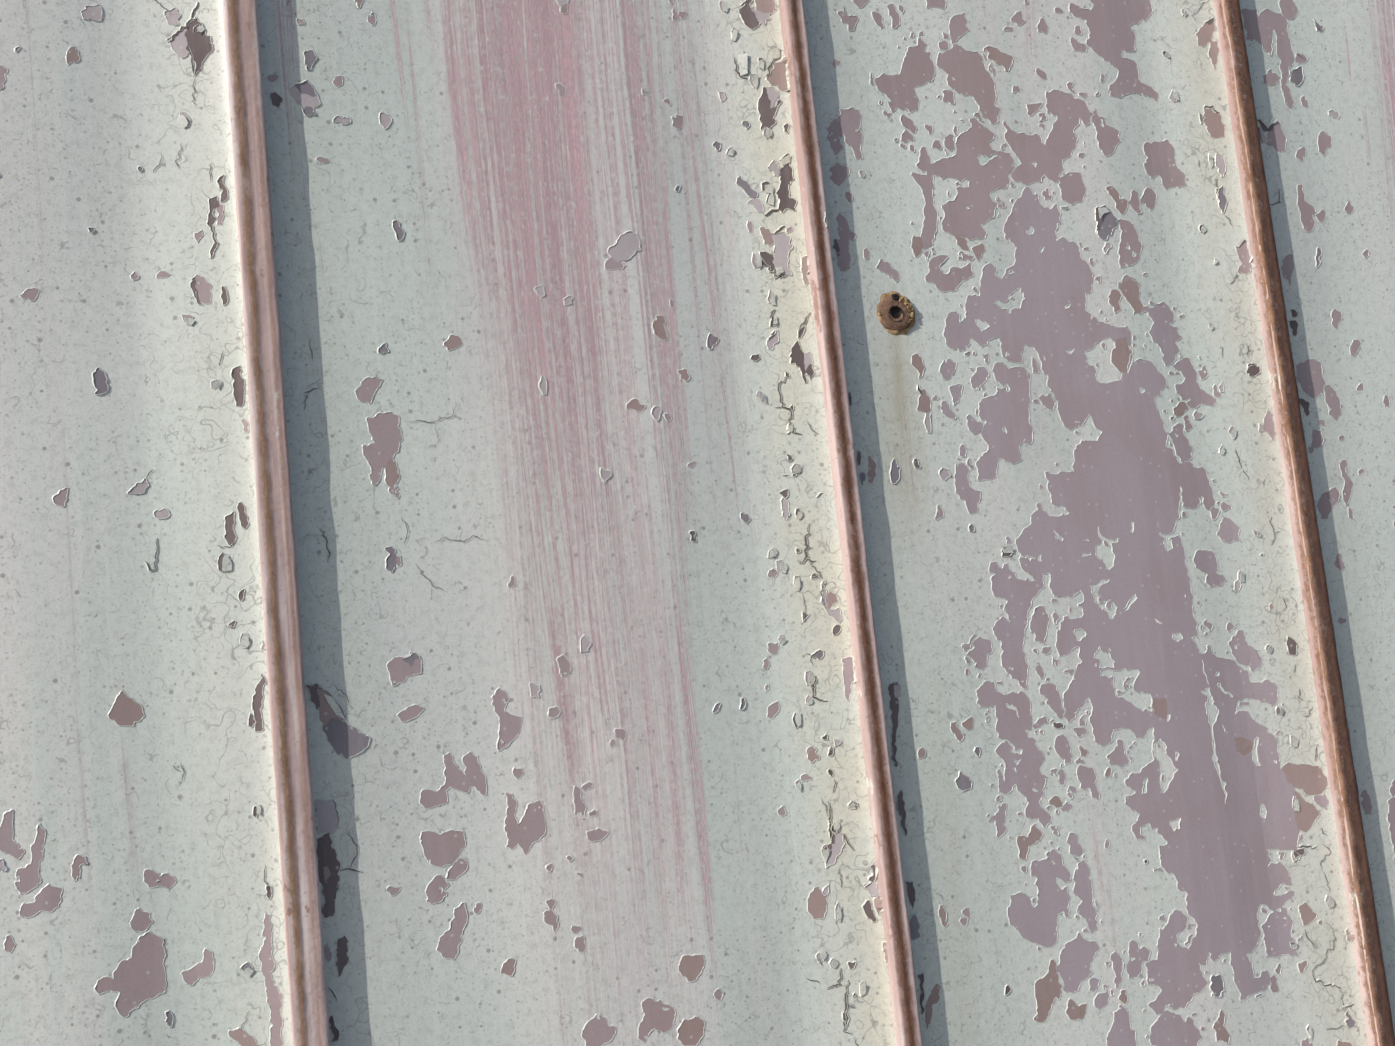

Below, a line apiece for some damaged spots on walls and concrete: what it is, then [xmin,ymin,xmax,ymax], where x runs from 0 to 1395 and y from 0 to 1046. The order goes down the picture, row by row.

peeling [155,0,214,128]
peeling [718,0,791,139]
peeling [193,164,229,258]
peeling [837,0,1346,1046]
peeling [247,673,267,733]
peeling [0,809,89,919]
peeling [93,907,216,1028]
peeling [228,865,284,1046]
peeling [314,799,362,918]
peeling [419,829,483,961]
peeling [419,751,547,855]
peeling [637,997,706,1046]